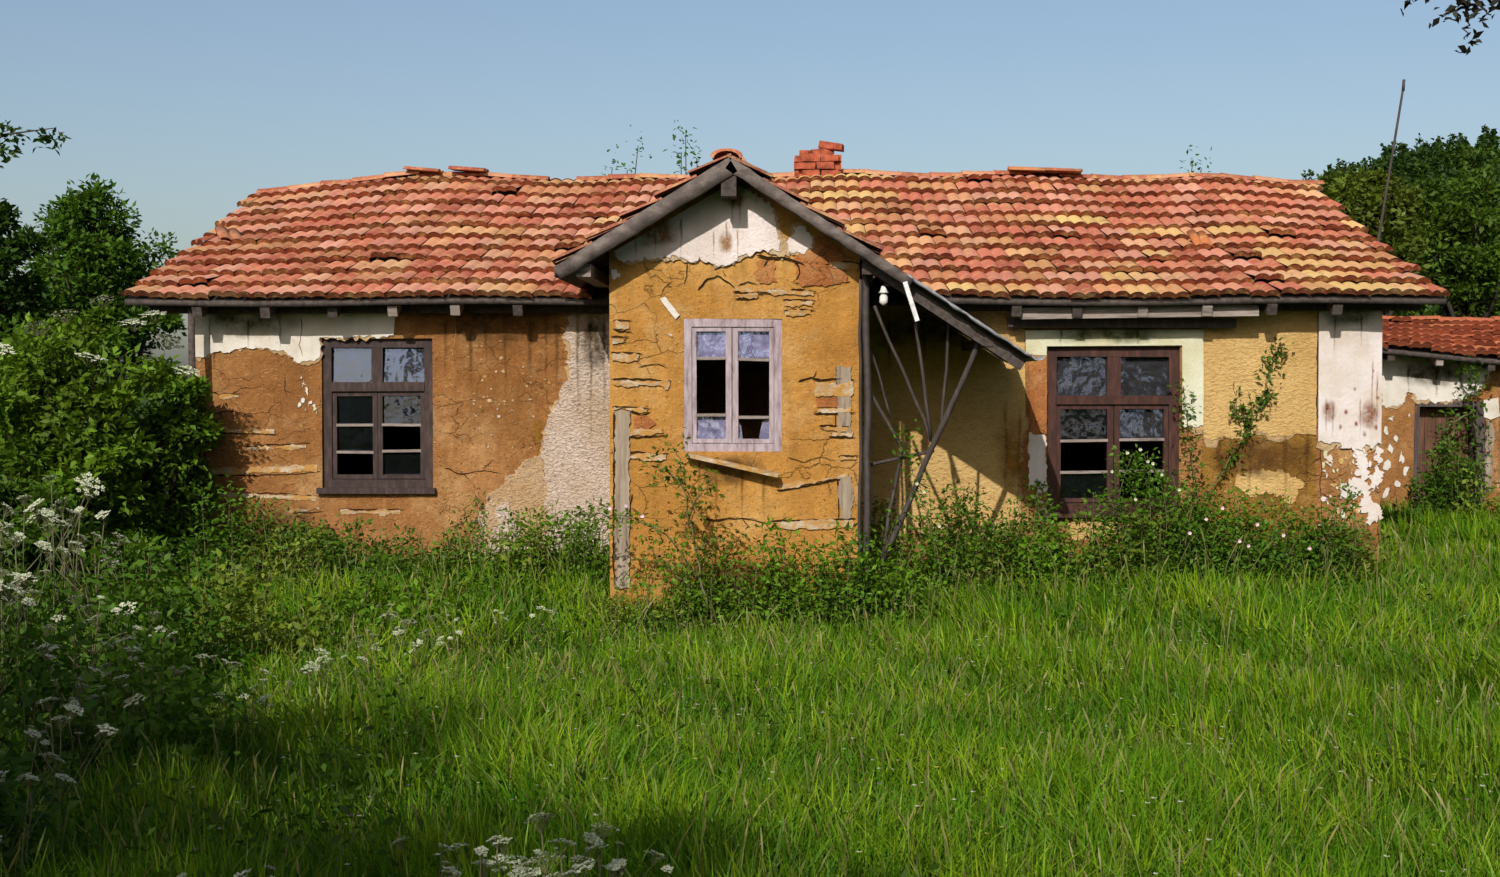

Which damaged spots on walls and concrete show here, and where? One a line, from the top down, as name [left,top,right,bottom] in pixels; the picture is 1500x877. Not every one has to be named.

peeling [611,184,850,287]
crack [660,255,804,296]
peeling [660,297,680,336]
spalling [815,397,837,407]
spalling [195,313,568,572]
peeling [1016,311,1500,565]
spalling [861,529,997,578]